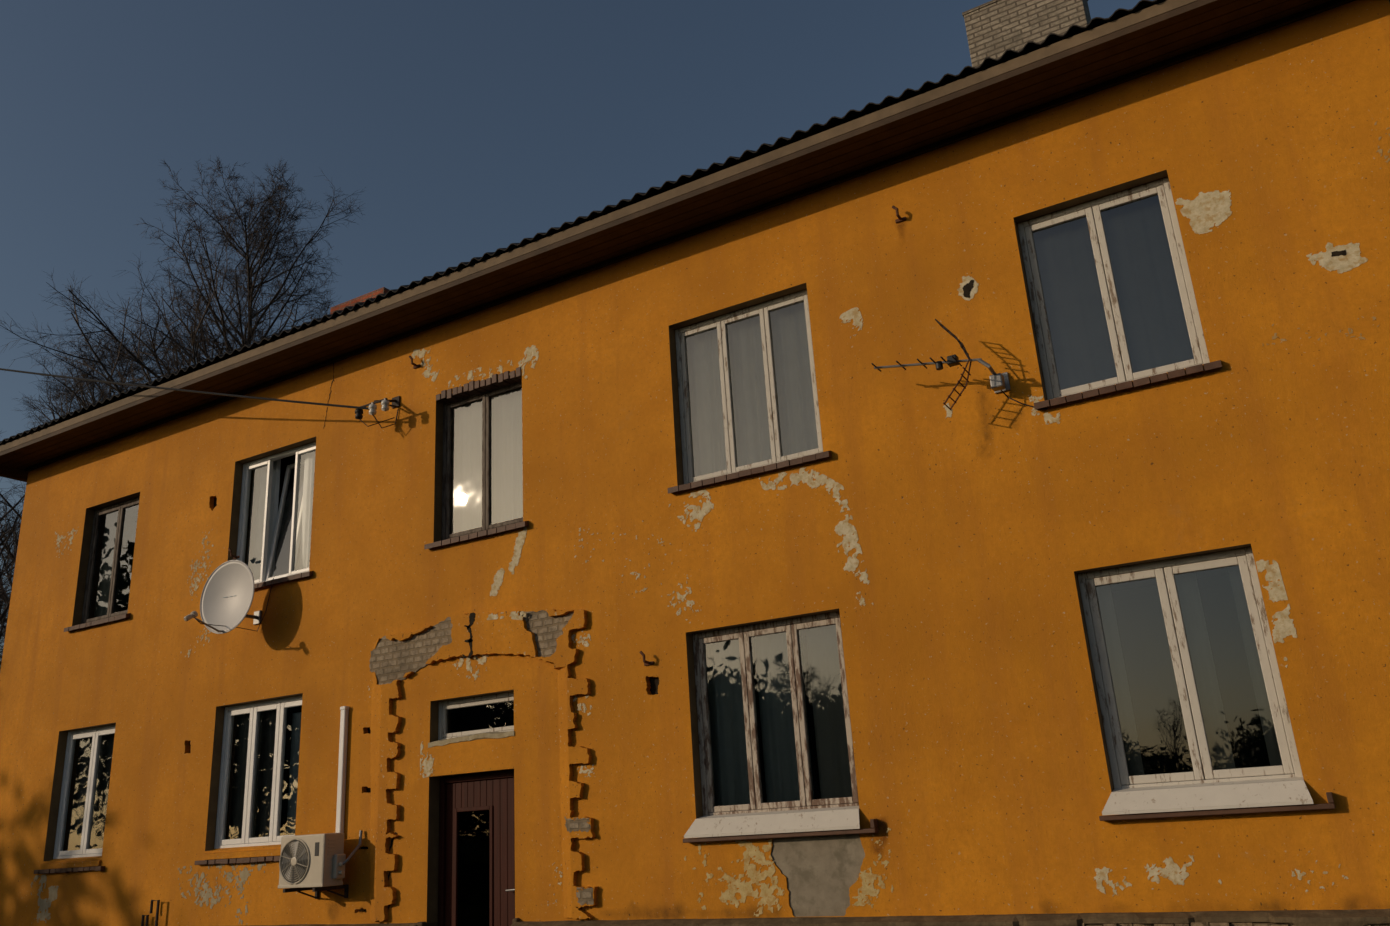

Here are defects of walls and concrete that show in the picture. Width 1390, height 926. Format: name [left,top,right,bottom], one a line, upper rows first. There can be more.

peeling [1175,190,1232,234]
peeling [1306,242,1368,274]
peeling [839,307,863,338]
peeling [412,345,539,388]
peeling [490,526,527,596]
peeling [759,468,873,607]
spalling [368,617,453,698]
crack [462,612,475,658]
spalling [487,610,591,657]
peeling [1256,560,1297,668]
spalling [684,828,894,917]
peeling [1094,855,1194,897]